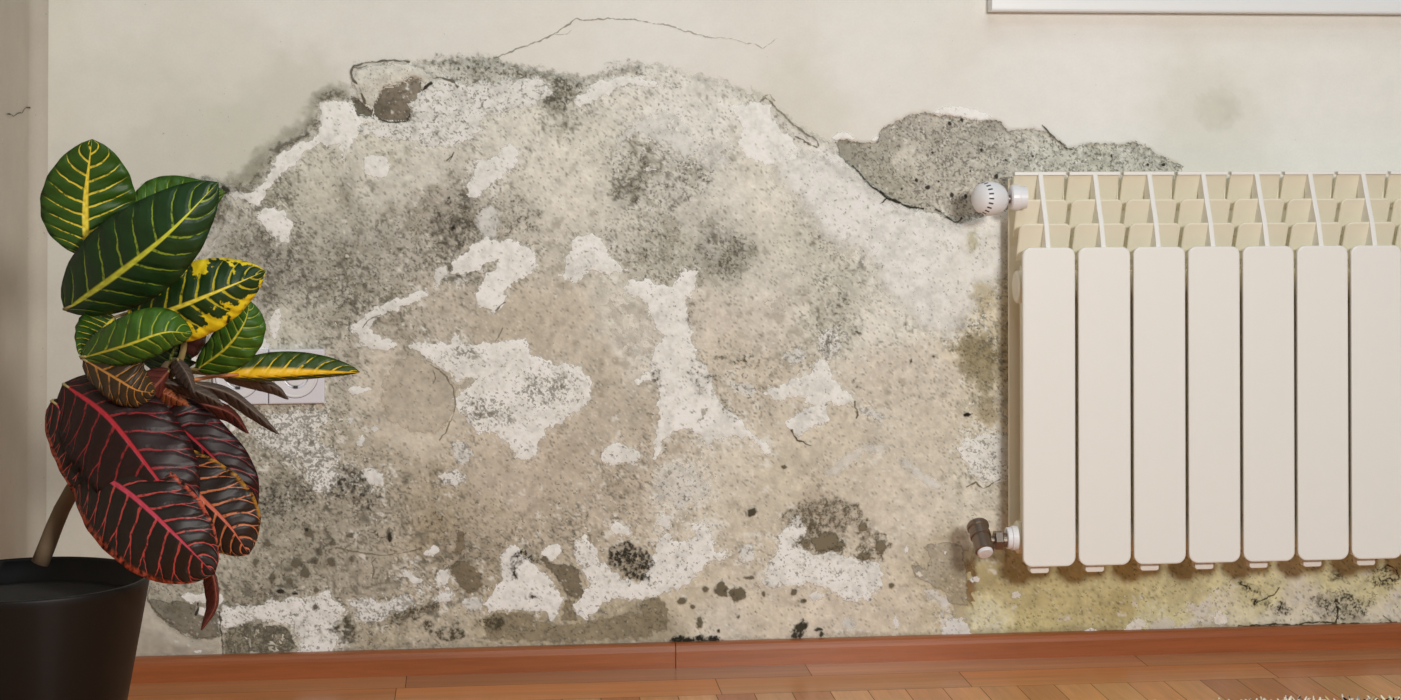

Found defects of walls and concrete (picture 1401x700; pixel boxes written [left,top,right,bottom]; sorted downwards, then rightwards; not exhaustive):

crack [493,18,760,59]
peeling [147,57,1183,654]
water stain [253,487,354,609]
water stain [334,616,359,643]
water stain [390,602,465,641]
water stain [609,541,654,580]
water stain [671,597,720,642]
water stain [703,576,765,618]
water stain [791,589,823,638]
water stain [782,497,892,562]
water stain [965,532,1401,633]
crack [1238,587,1391,626]